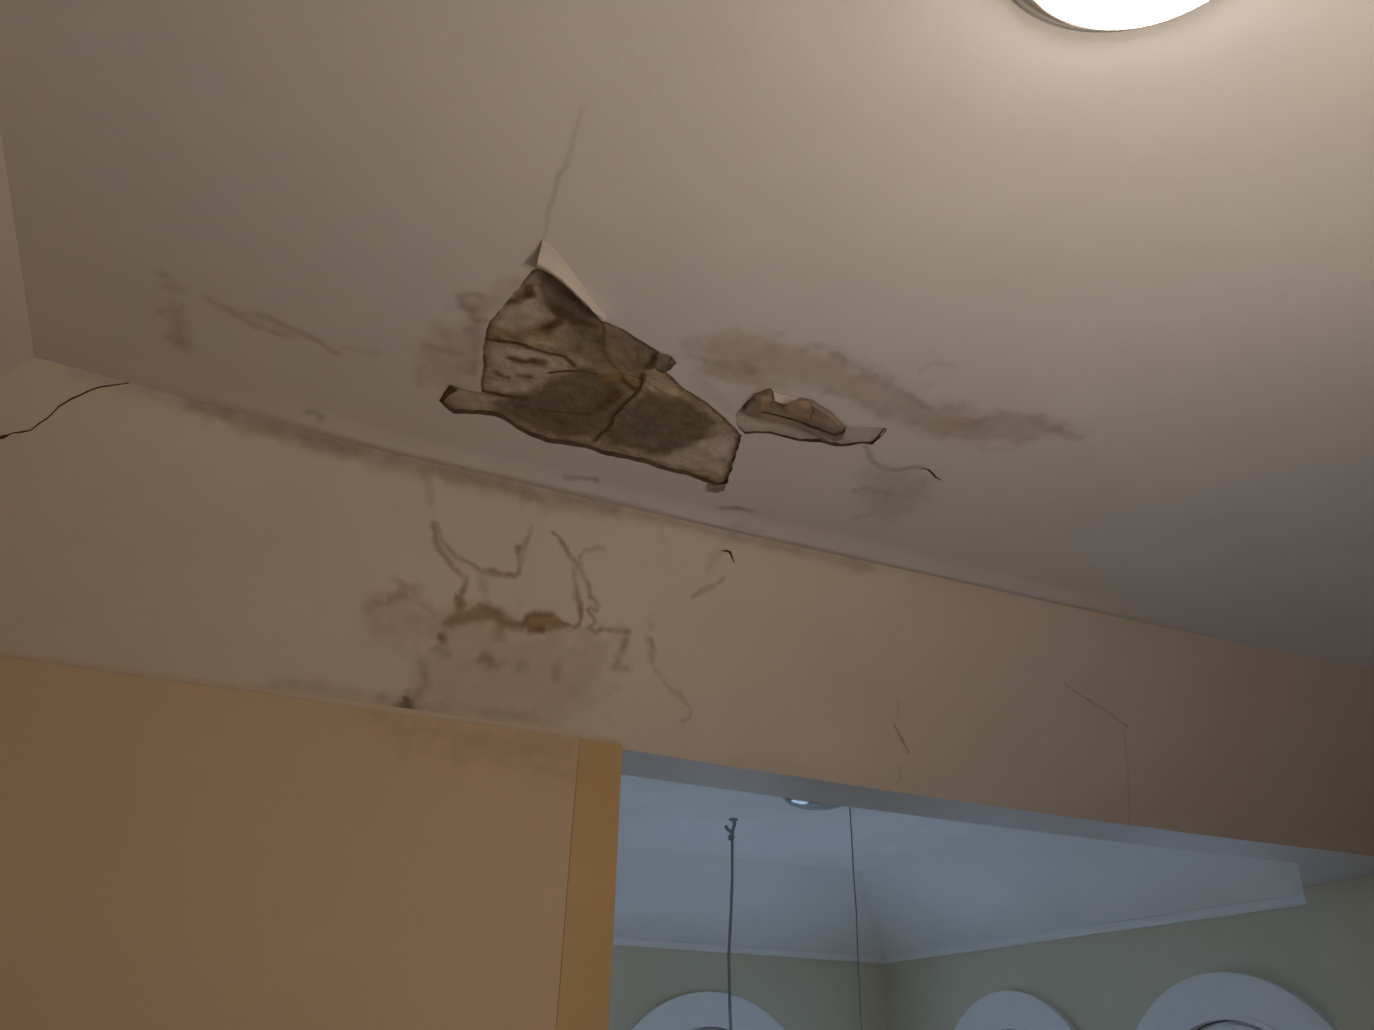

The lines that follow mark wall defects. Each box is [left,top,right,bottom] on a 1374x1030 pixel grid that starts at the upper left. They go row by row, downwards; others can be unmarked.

peeling [537,240,608,320]
peeling [656,353,677,373]
peeling [439,385,457,402]
peeling [773,391,800,405]
crack [0,382,128,439]